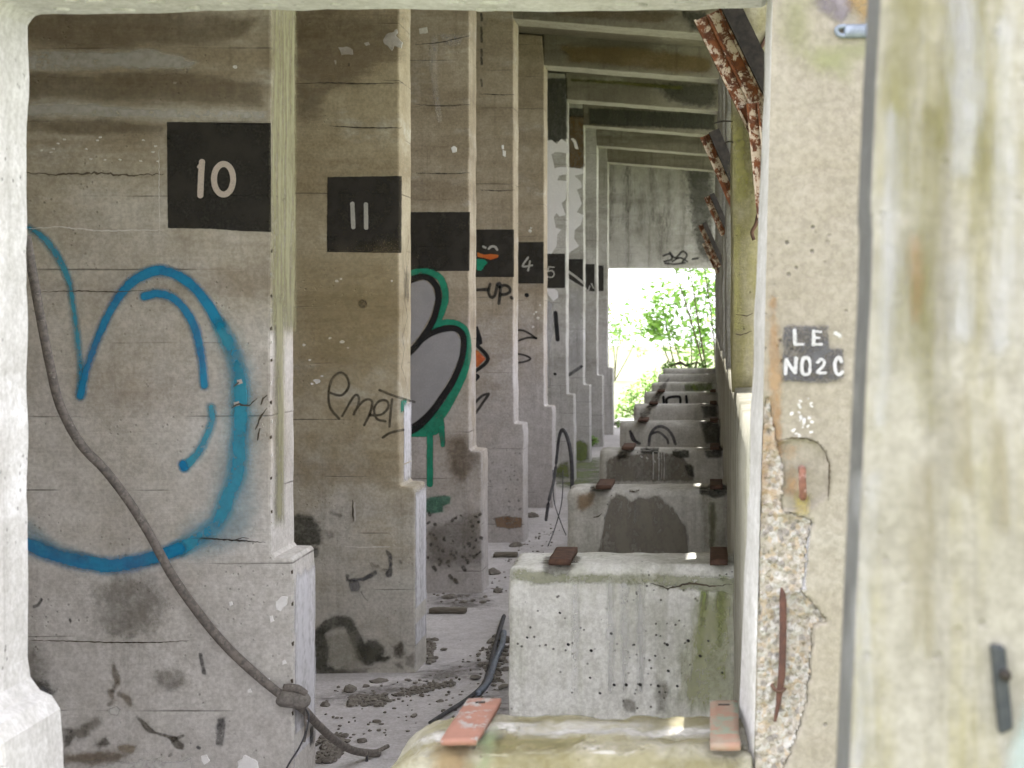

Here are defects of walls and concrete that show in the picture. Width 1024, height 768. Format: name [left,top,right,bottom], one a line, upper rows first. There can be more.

damp [28,13,245,47]
crack [29,164,160,232]
damp [606,354,736,547]
damp [599,495,688,553]
damp [687,577,732,705]
rust [770,587,787,722]
spalling [755,399,826,768]